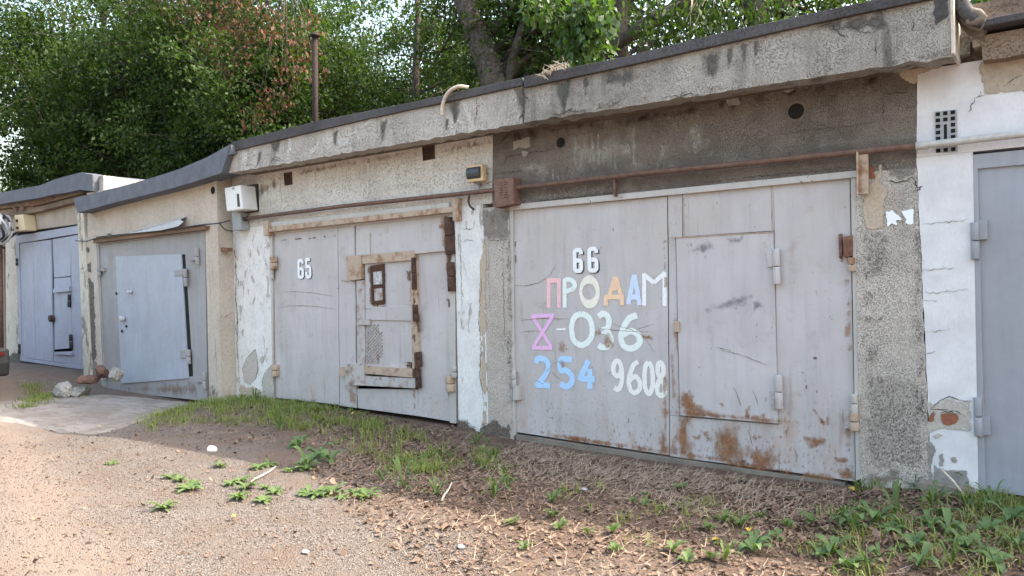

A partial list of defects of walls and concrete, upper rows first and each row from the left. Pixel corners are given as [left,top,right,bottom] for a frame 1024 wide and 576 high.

damp [707,42,758,76]
spalling [869,157,914,179]
peeling [240,349,274,398]
corrosion [659,370,789,474]
spalling [926,396,971,486]